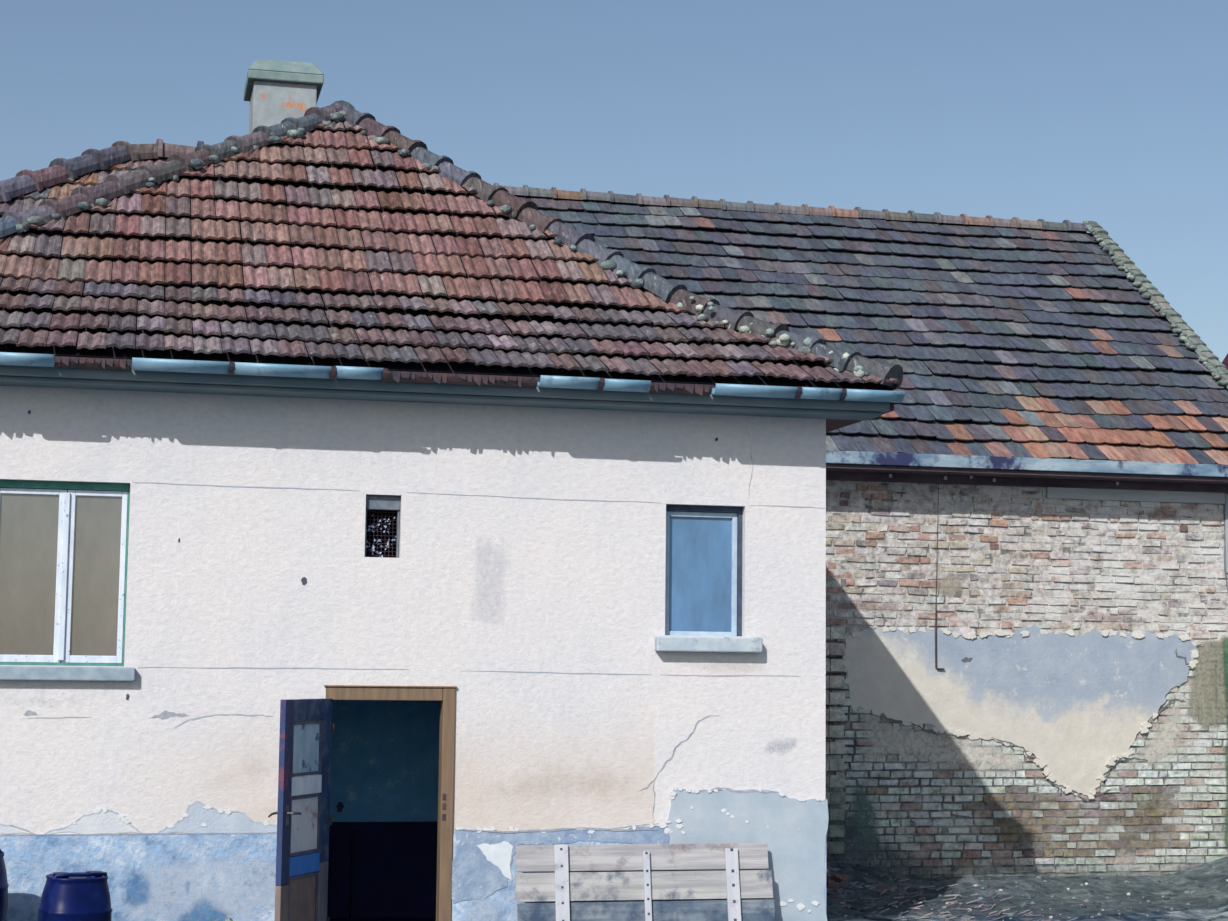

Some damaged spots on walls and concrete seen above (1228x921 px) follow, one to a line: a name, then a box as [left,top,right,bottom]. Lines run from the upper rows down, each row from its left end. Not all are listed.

crack [137,664,350,672]
crack [496,669,787,677]
flaking render [842,616,1201,799]
crack [465,715,720,833]
flaking render [0,808,142,834]
flaking render [158,801,277,833]
flaking render [452,787,829,921]